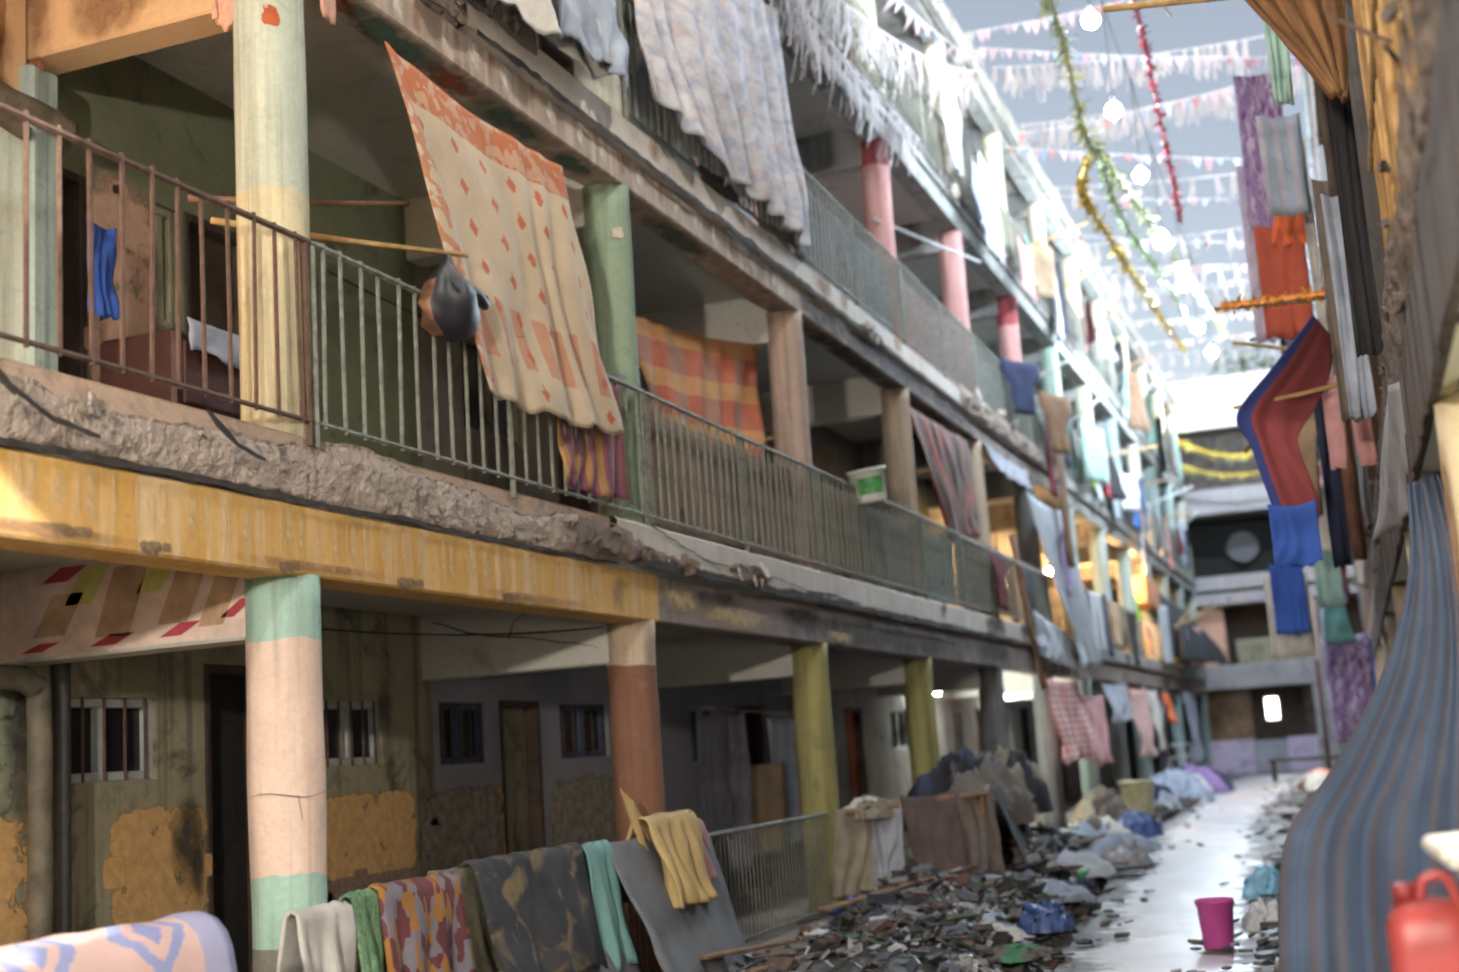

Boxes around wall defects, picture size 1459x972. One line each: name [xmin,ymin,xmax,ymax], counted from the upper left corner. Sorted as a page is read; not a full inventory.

water stain [26,0,46,45]
water stain [77,0,133,34]
spalling [0,176,706,576]
water stain [9,692,27,771]
peeling [0,690,27,947]
peeling [103,805,212,926]
peeling [327,785,507,903]